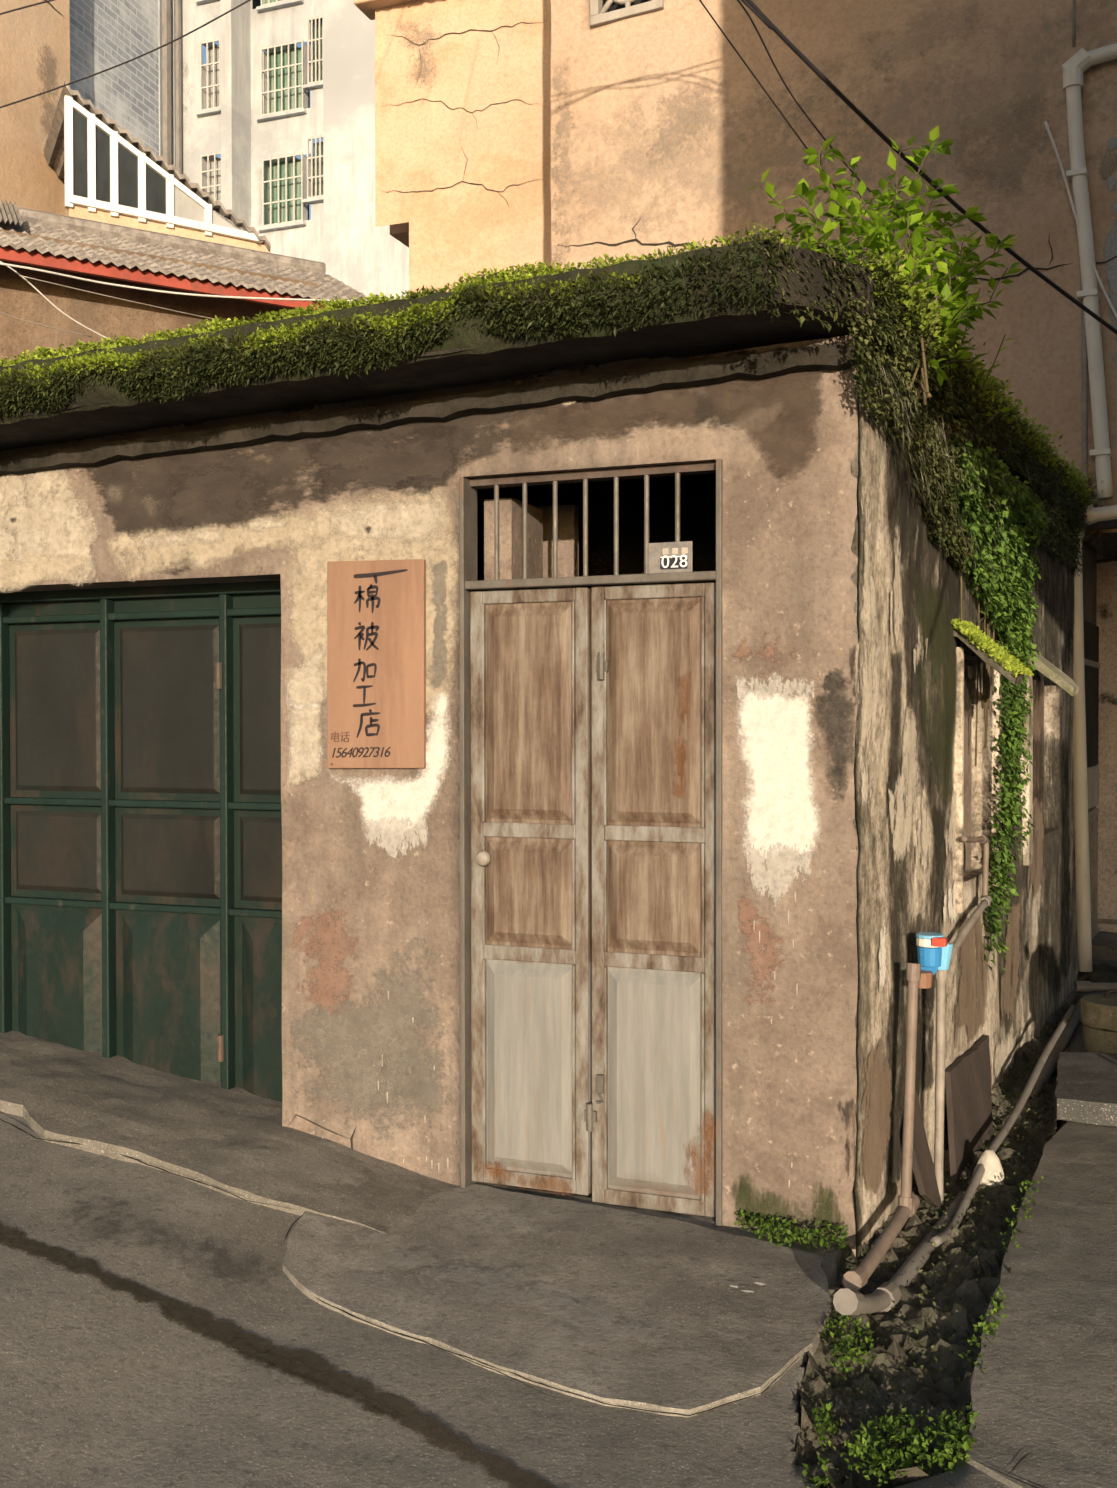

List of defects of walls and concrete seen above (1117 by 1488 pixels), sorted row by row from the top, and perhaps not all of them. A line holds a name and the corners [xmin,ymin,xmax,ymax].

crack [381,20,548,206]
crack [557,218,708,248]
peeling [0,469,458,715]
water stain [884,393,1110,1189]
crack [972,1452,1039,1488]